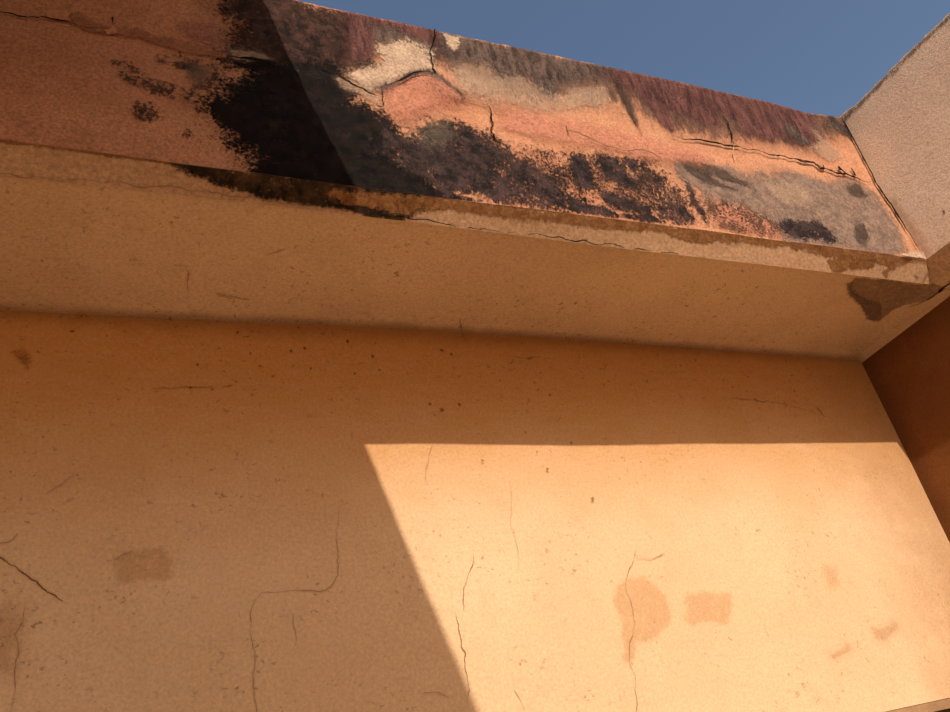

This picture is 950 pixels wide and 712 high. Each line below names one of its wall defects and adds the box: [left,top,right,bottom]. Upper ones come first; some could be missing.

crack [0,11,113,28]
crack [2,173,346,211]
crack [424,29,436,74]
crack [464,96,498,142]
crack [376,213,677,254]
damp [111,0,950,258]
crack [566,126,662,158]
crack [676,116,950,307]
crack [0,534,62,712]
crack [250,497,345,712]
crack [421,554,474,699]
crack [626,551,664,712]